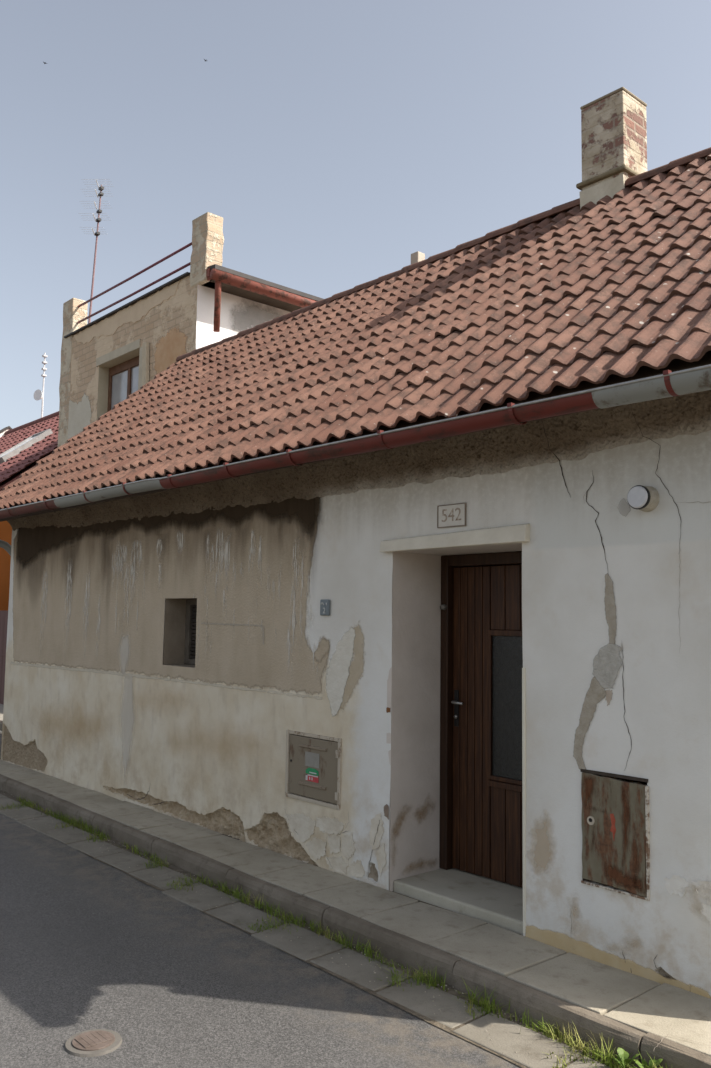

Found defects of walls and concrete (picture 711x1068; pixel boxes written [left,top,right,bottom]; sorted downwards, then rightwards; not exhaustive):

flaking render [74,281,180,344]
leakage [17,496,320,620]
peeling [13,502,364,716]
crack [542,421,608,569]
crack [631,409,708,651]
spalling [2,726,48,772]
flaking render [108,787,389,882]
corrosion [584,777,595,810]
corrosion [606,787,643,892]